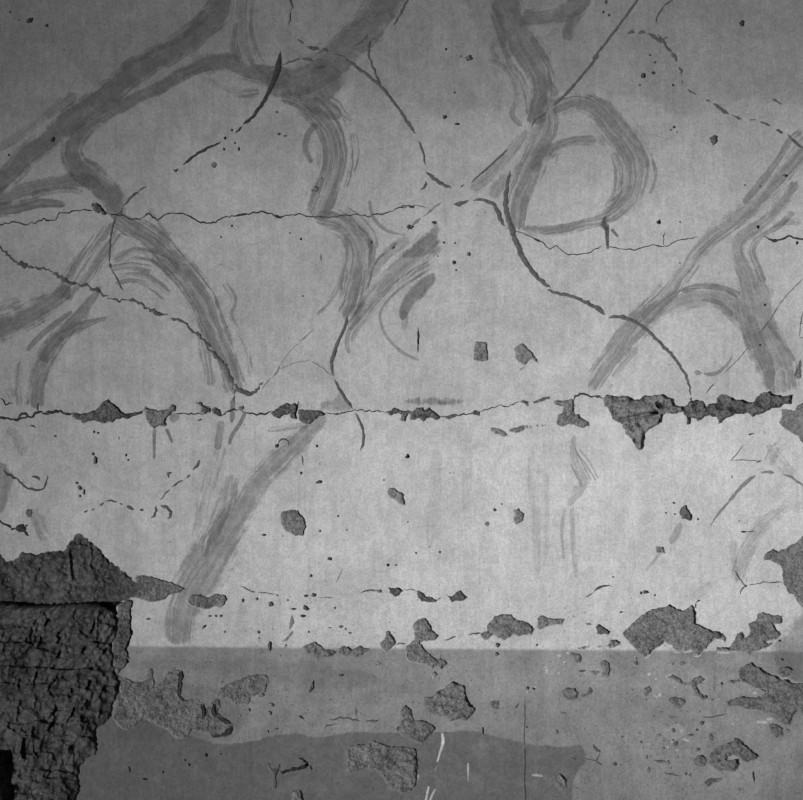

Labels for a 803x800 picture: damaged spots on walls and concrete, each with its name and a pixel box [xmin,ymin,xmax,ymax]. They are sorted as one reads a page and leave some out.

crack [0,0,803,451]
spalling [603,391,803,450]
spalling [280,509,307,537]
spalling [763,536,803,608]
spalling [0,533,275,800]
spalling [380,631,396,652]
spalling [405,618,449,679]
spalling [480,614,565,656]
spalling [557,604,803,738]
spalling [346,681,476,793]
spalling [661,721,705,751]
spalling [684,733,759,787]